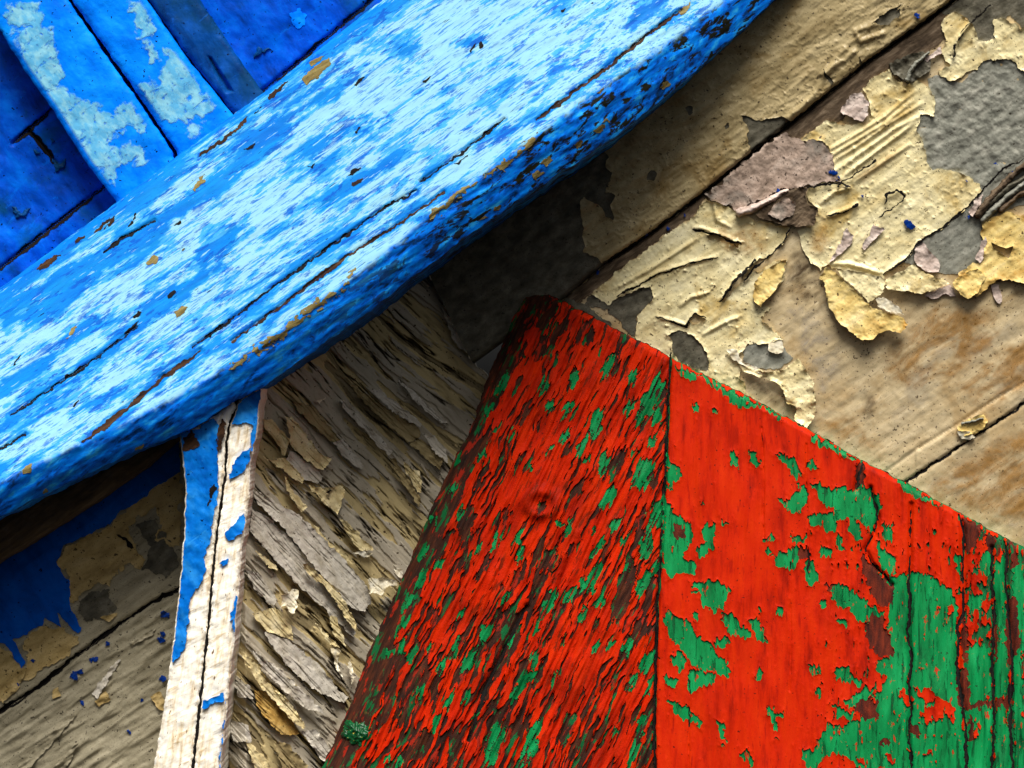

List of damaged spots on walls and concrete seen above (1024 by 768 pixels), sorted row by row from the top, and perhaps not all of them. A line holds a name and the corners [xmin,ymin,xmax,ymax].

peeling [3,1,148,184]
peeling [127,2,216,138]
peeling [199,82,287,156]
peeling [302,56,331,85]
peeling [37,255,61,270]
peeling [229,267,356,370]
crack [81,118,505,443]
peeling [341,376,462,506]
peeling [383,0,1024,768]
crack [191,413,233,768]
peeling [55,389,446,768]
peeling [0,625,79,703]